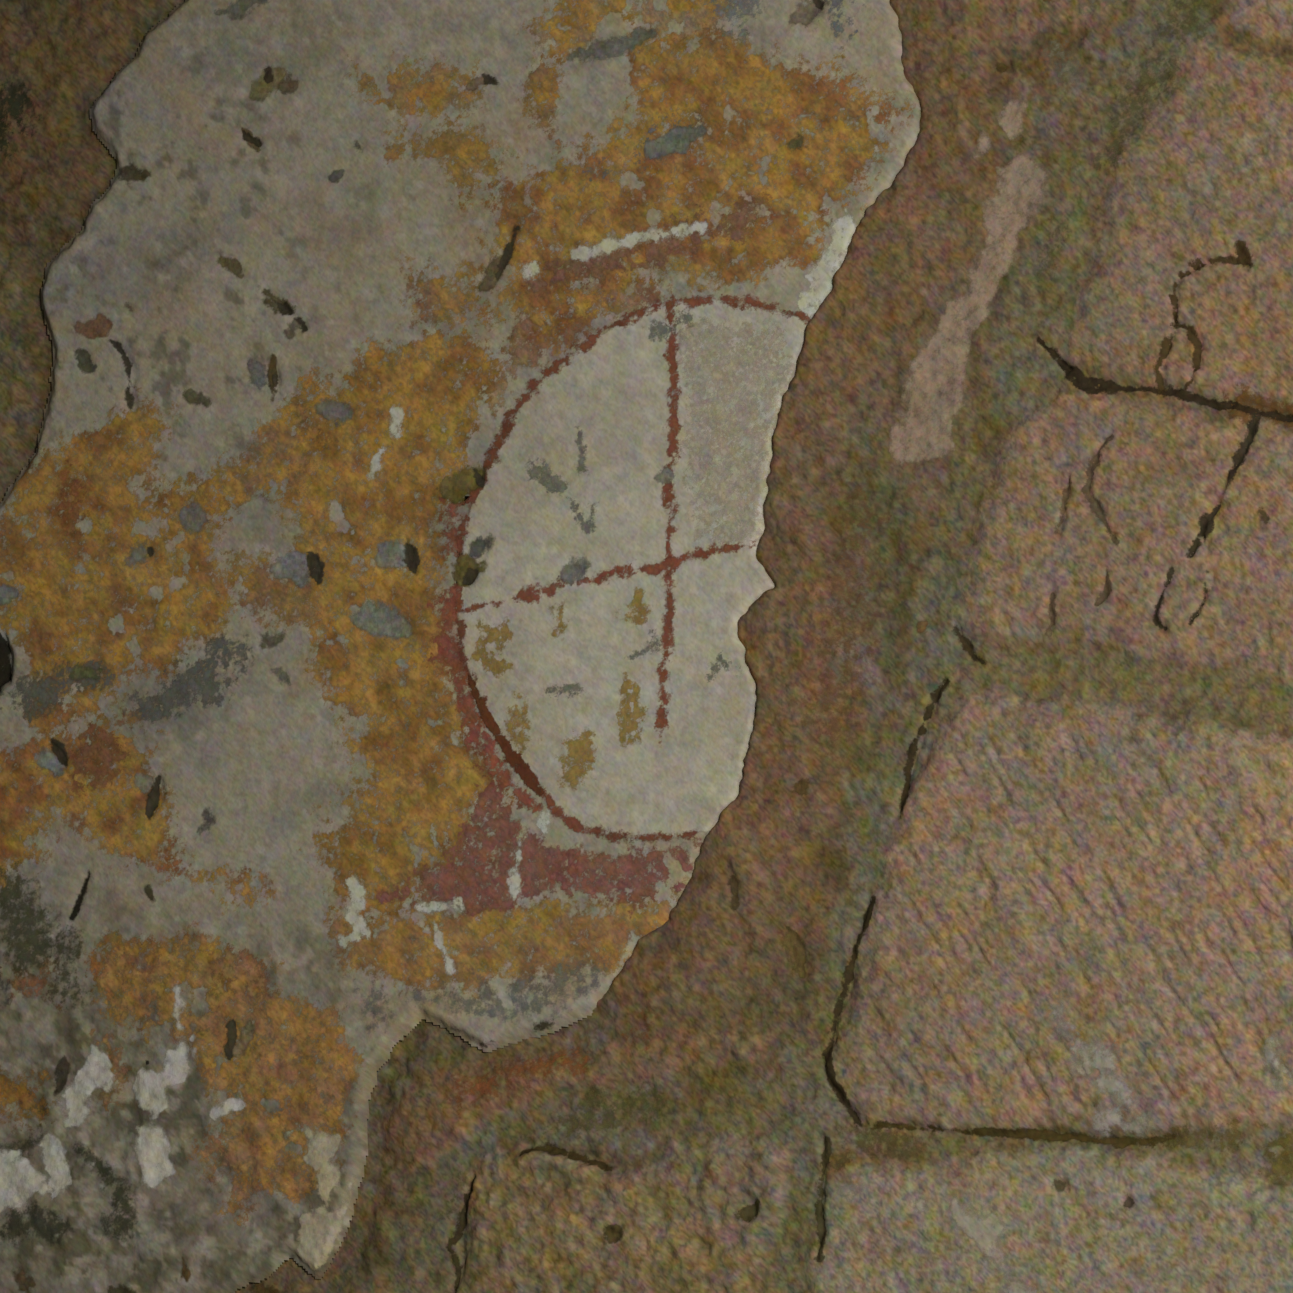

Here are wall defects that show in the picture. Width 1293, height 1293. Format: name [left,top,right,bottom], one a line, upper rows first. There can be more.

spalling [496,226,520,280]
spalling [275,301,308,332]
crack [1037,240,1293,637]
spalling [307,551,325,584]
spalling [402,543,421,574]
spalling [51,738,68,766]
spalling [146,775,161,819]
spalling [223,1019,237,1060]
flaking render [132,986,196,1188]
flaking render [0,1045,115,1213]
flaking render [209,1098,246,1121]
flaking render [296,1125,353,1271]